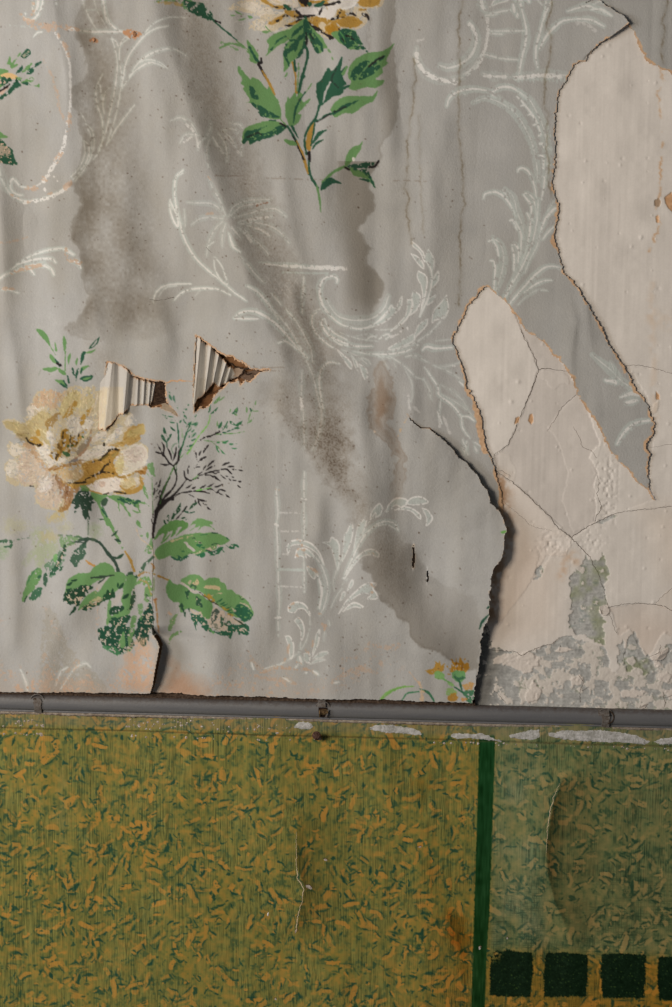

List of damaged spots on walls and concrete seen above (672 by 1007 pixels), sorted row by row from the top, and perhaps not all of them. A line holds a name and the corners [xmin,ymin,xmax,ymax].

water stain [63,0,188,345]
water stain [331,0,426,321]
flaking render [654,192,672,212]
peeling [322,420,672,710]
peeling [505,301,660,500]
crack [496,332,672,633]
crack [295,832,304,932]